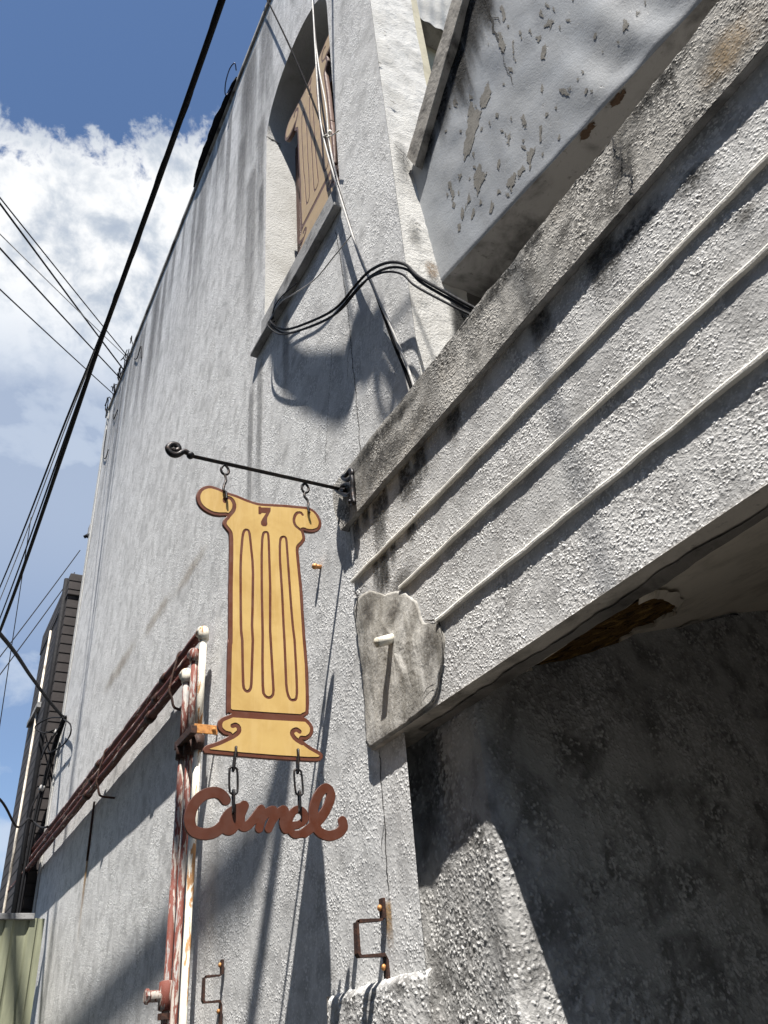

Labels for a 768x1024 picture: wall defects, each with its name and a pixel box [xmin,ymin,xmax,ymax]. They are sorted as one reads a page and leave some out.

peeling [500,3,571,72]
peeling [444,70,593,231]
spalling [580,122,596,141]
spalling [610,89,626,108]
damp [587,207,654,283]
damp [357,401,408,476]
damp [446,407,459,435]
damp [353,445,426,543]
damp [373,543,409,616]
flaking render [419,507,768,732]
crack [379,753,389,891]